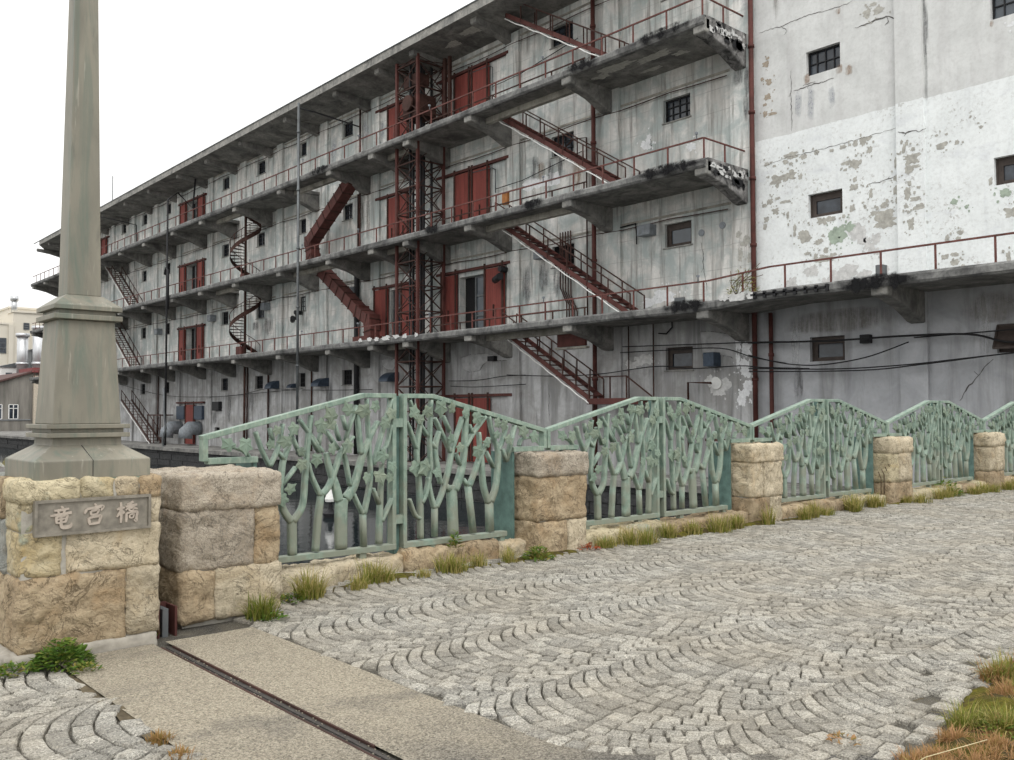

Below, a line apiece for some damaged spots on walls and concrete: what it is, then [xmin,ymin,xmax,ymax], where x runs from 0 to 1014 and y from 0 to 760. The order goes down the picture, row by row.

spalling [709,21,747,51]
crack [761,4,845,35]
spalling [710,162,748,190]
peeling [762,131,965,287]
peeling [988,177,1014,218]
peeling [704,341,753,409]
crack [961,359,993,399]